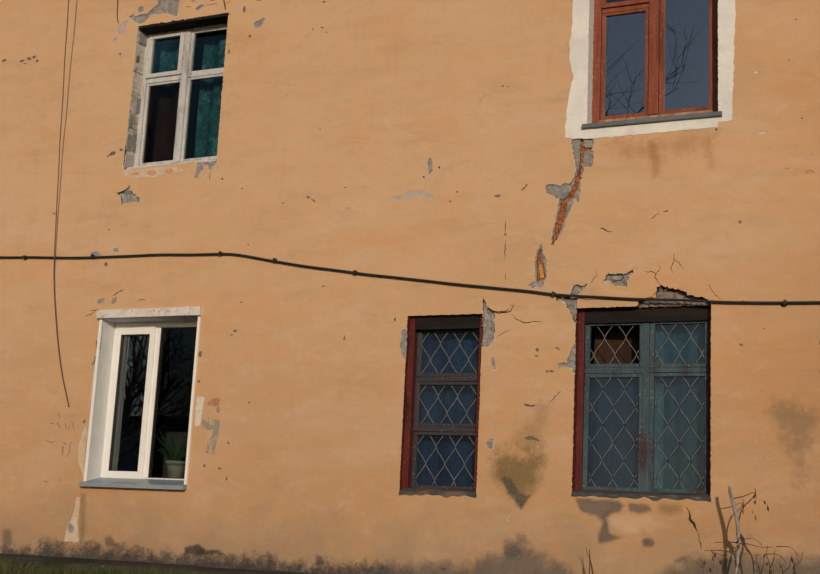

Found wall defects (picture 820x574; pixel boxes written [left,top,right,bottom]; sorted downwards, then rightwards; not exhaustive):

flaking render [113,0,213,46]
peeling [107,98,141,170]
flaking render [114,185,140,204]
flaking render [194,161,218,179]
crack [529,139,594,290]
flaking render [556,269,634,325]
flaking render [638,266,711,308]
flaking render [481,297,514,371]
water stain [496,455,543,508]
water stain [2,497,567,574]
water stain [577,498,669,546]
water stain [670,558,820,574]